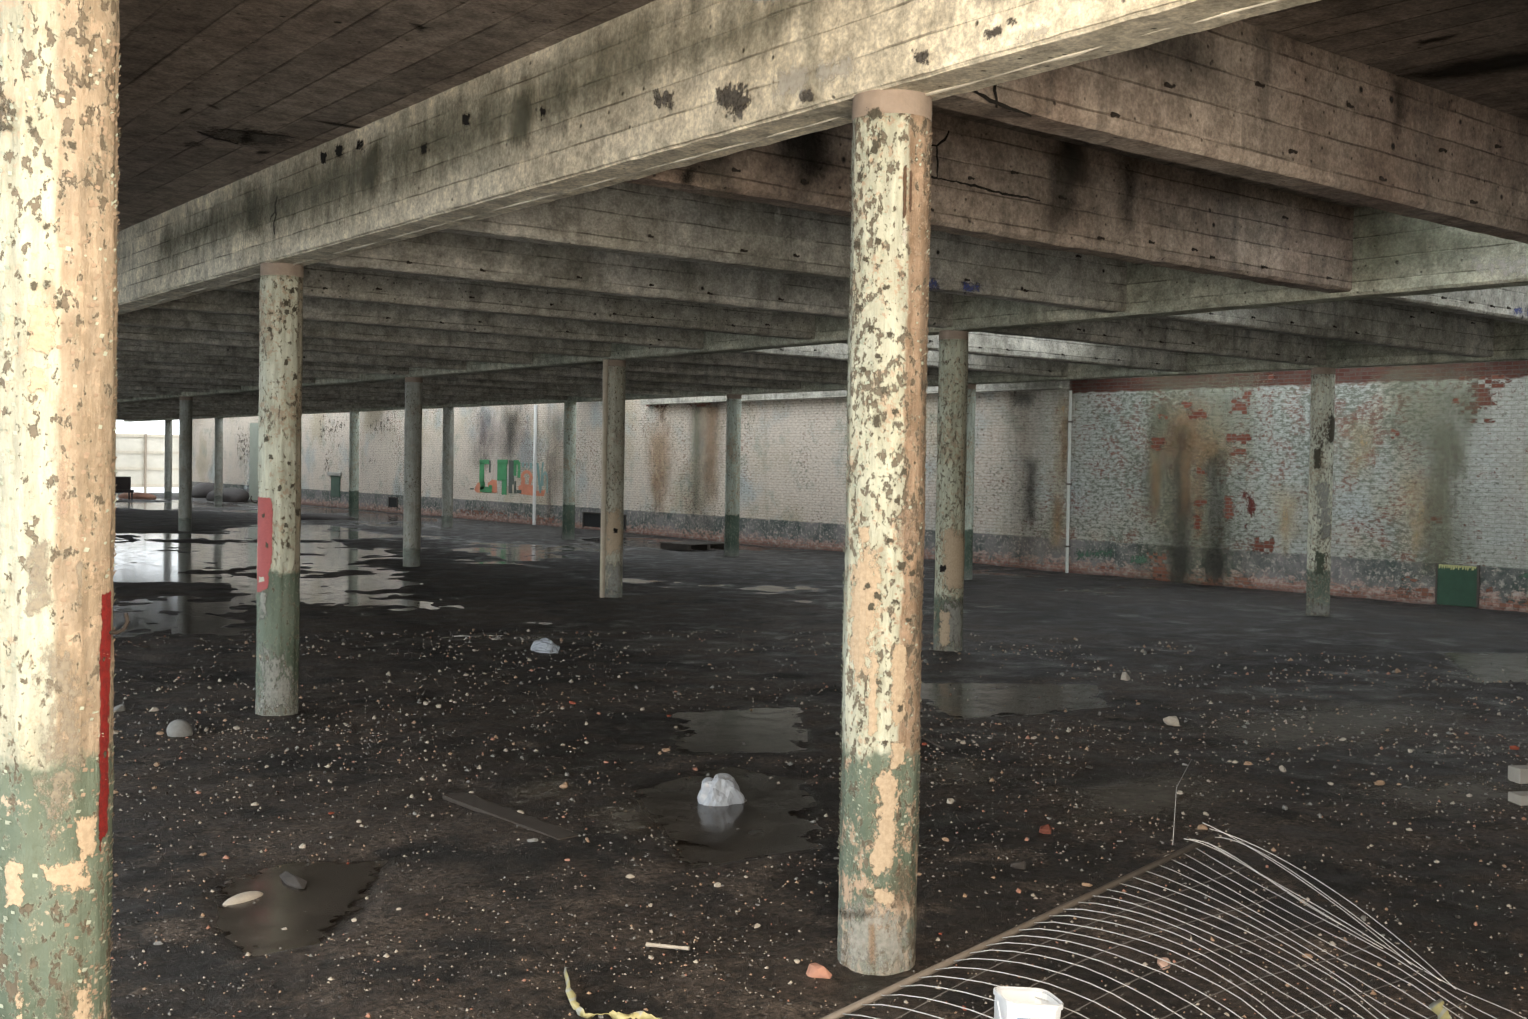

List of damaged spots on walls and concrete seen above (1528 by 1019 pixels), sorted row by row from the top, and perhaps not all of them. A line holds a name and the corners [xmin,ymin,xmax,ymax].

spalling [653,89,675,110]
spalling [715,82,751,122]
spalling [799,89,815,104]
crack [931,130,1040,201]
peeling [1225,390,1254,458]
peeling [1452,370,1512,434]
spalling [0,36,122,1019]
peeling [837,107,965,906]
damp [1156,397,1229,568]
peeling [1193,490,1275,555]